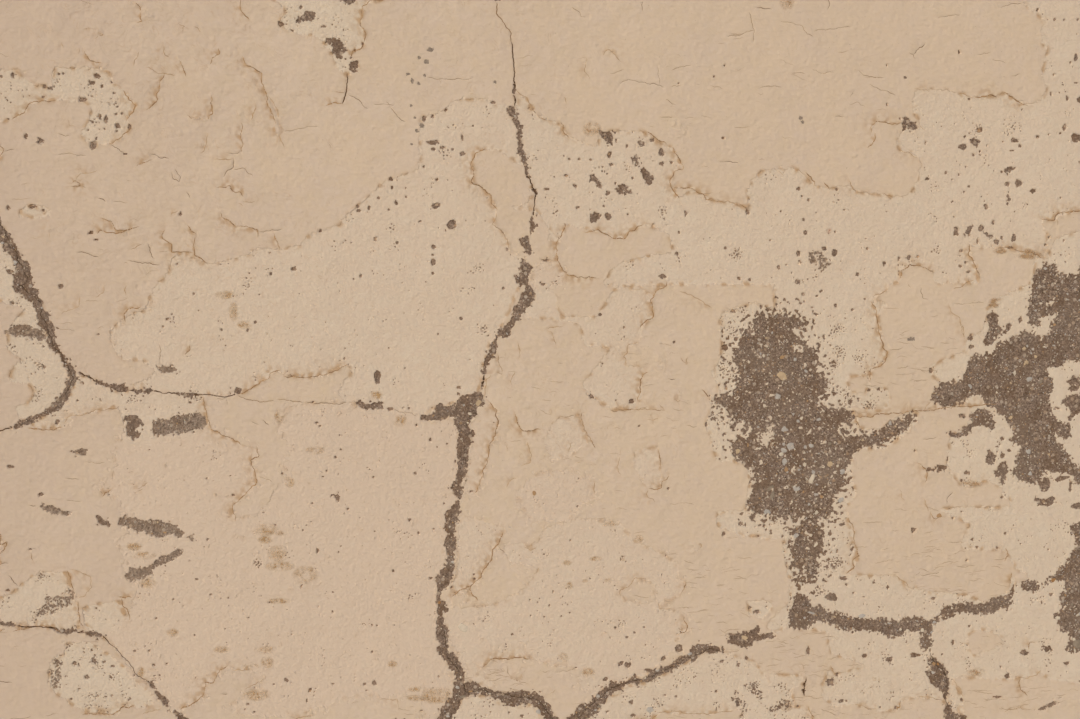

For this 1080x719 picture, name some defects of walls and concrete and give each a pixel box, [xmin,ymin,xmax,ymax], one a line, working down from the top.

crack [219,123,253,176]
peeling [275,0,383,82]
crack [339,76,403,121]
crack [0,180,346,431]
peeling [0,97,525,719]
crack [395,0,912,719]
peeling [512,0,1080,589]
peeling [440,509,692,695]
peeling [591,648,794,719]
crack [861,493,1006,596]